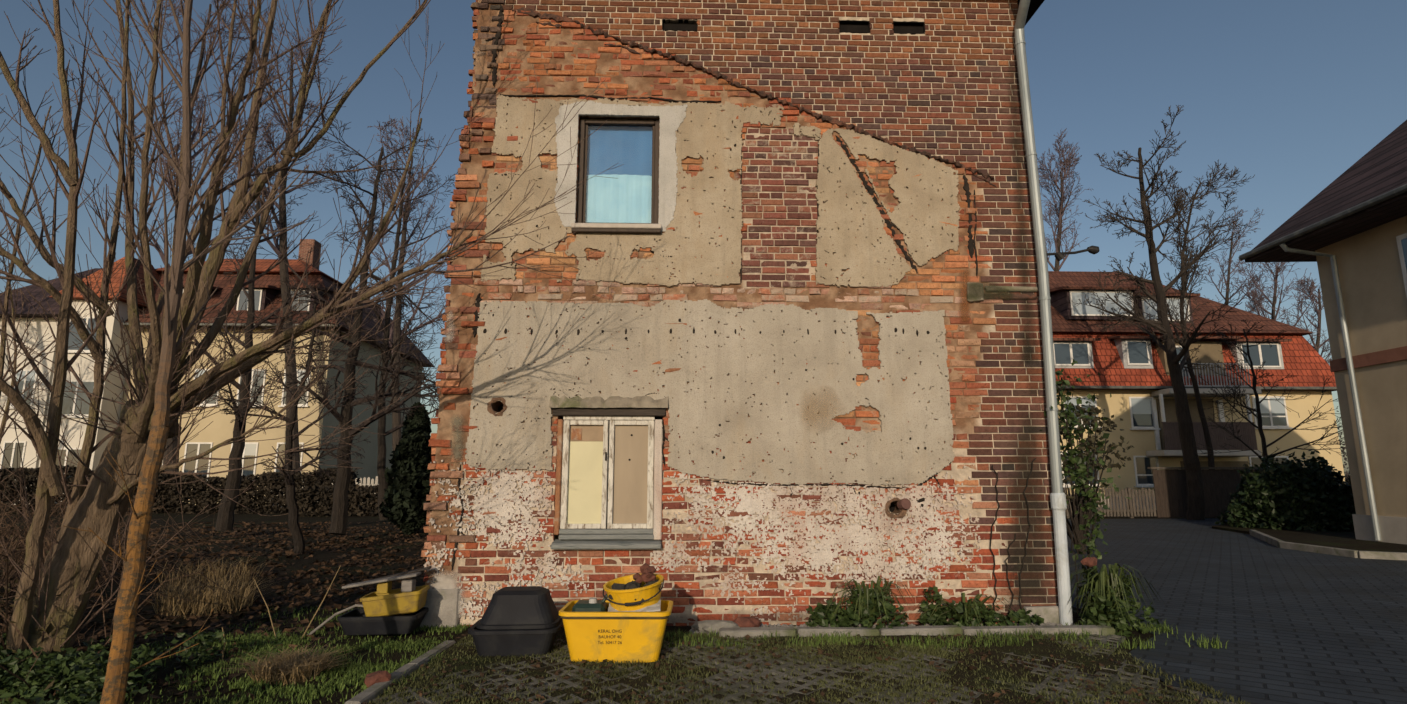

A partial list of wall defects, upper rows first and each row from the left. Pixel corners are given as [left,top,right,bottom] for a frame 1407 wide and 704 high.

flaking render [539,154,557,172]
crack [816,135,918,273]
flaking render [849,154,898,213]
peeling [474,233,1003,623]
water stain [434,575,460,611]